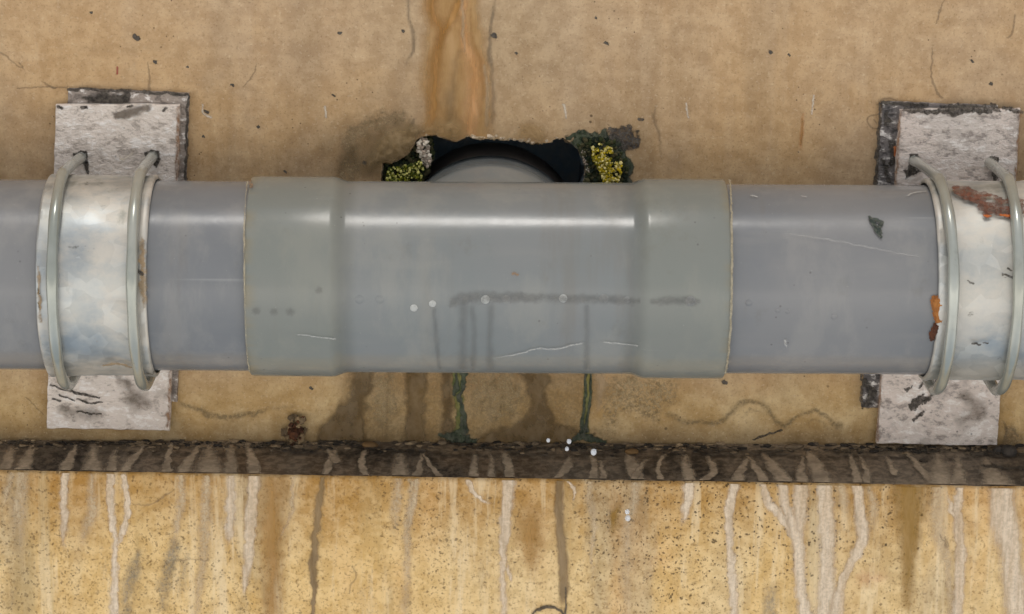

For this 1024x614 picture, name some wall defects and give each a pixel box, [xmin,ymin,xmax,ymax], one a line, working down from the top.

spalling [416,130,444,168]
corrosion [422,0,491,139]
spalling [466,134,562,144]
damp [60,444,145,614]
damp [160,442,261,610]
damp [308,372,372,614]
damp [391,373,443,585]
damp [440,373,607,614]
damp [681,455,718,519]
damp [724,451,876,614]
damp [907,454,967,614]
damp [982,459,1024,614]